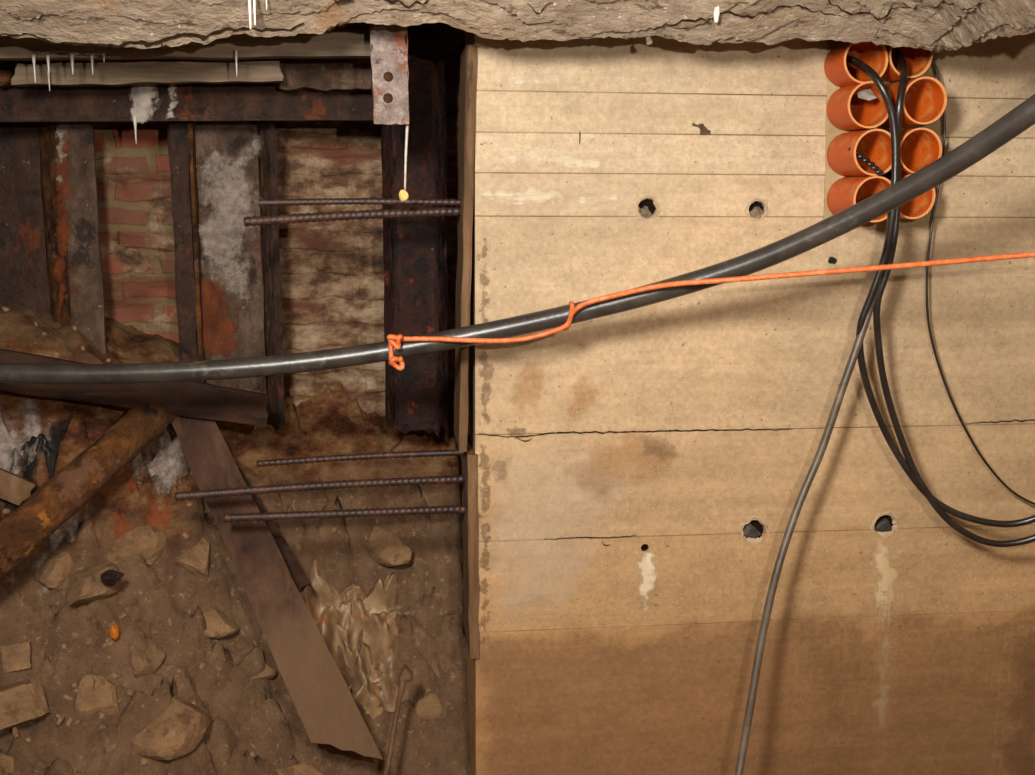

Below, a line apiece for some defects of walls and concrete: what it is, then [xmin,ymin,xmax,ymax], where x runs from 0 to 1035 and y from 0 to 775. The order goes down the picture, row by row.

crack [0,23,304,48]
crack [384,0,428,8]
crack [653,0,981,30]
water stain [199,141,259,299]
water stain [598,553,657,625]
water stain [821,543,907,620]